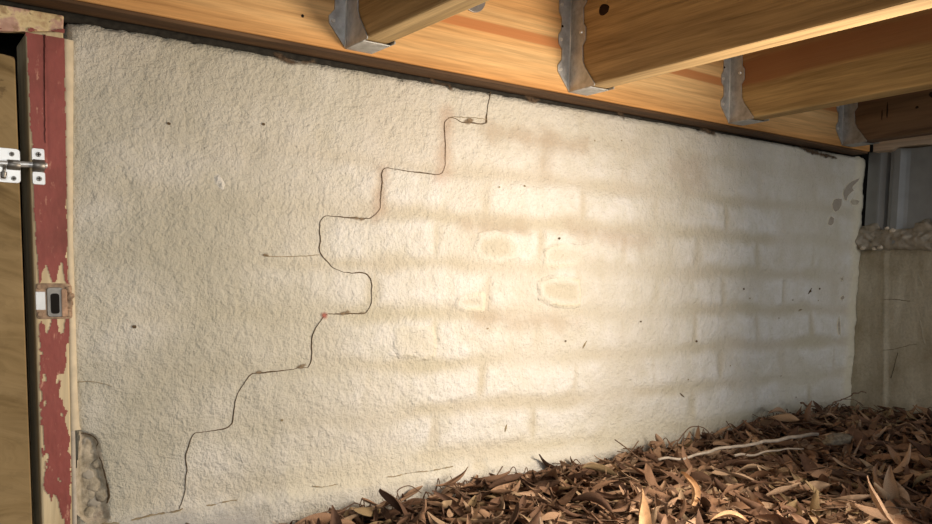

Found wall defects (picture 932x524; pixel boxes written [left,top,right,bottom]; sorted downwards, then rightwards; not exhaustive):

peeling [26,28,70,284]
peeling [39,319,111,524]
crack [102,92,491,524]